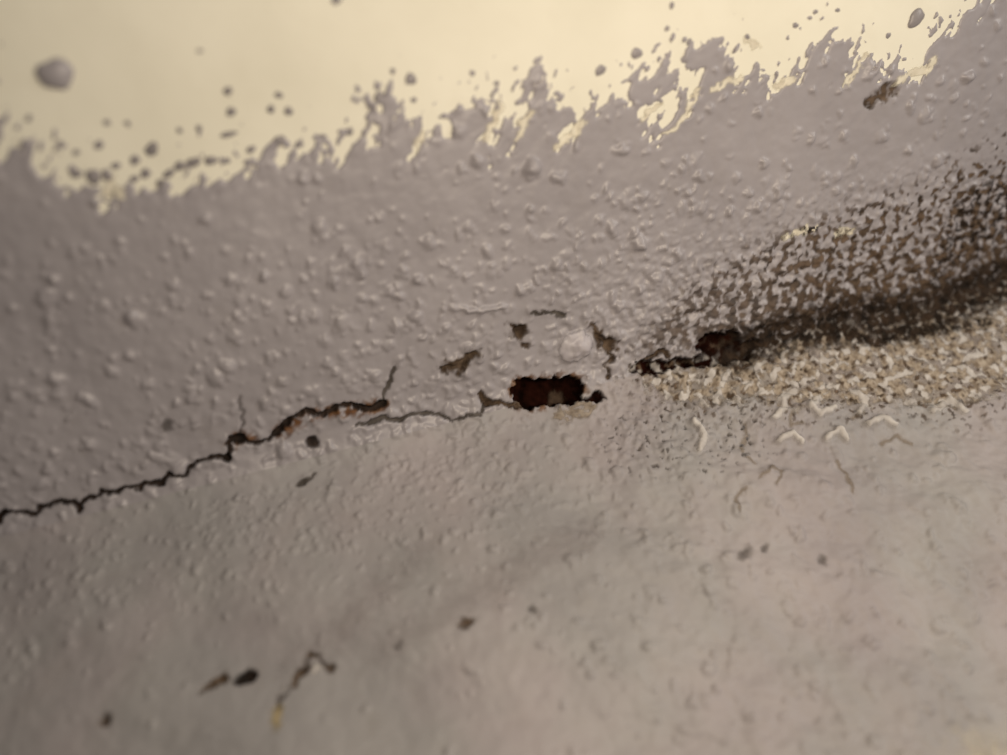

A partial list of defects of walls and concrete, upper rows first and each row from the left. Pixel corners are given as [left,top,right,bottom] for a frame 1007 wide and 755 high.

peeling [842,52,869,88]
peeling [892,56,937,87]
peeling [514,110,535,142]
peeling [553,119,587,151]
peeling [662,75,744,134]
peeling [781,224,818,241]
leakage [721,260,1007,373]
spalling [590,323,620,380]
spalling [629,281,1007,450]
spalling [478,374,607,421]
crack [0,366,484,524]